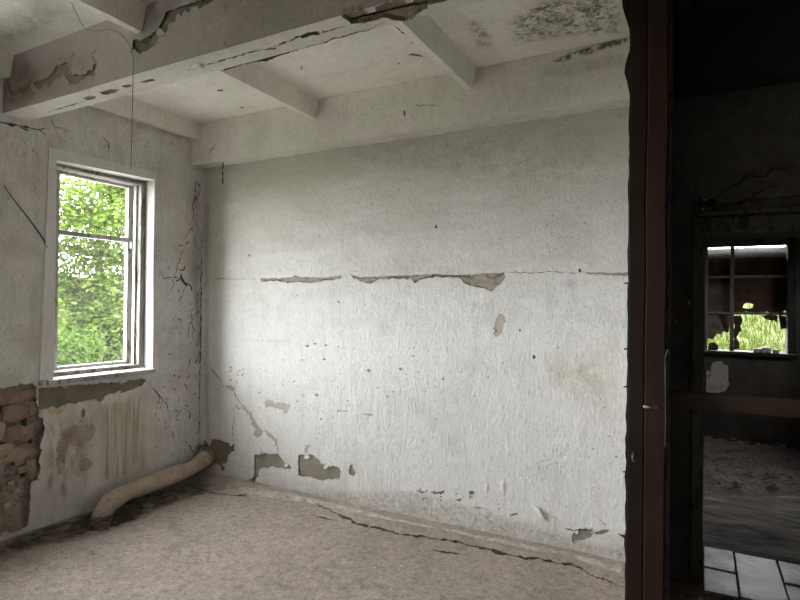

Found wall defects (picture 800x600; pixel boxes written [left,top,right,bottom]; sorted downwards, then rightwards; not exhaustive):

peeling [130,0,214,54]
crack [188,23,413,71]
damp [519,0,626,61]
peeling [6,62,97,95]
peeling [261,275,341,283]
peeling [351,272,505,291]
crack [154,181,244,454]
spalling [0,378,146,539]
peeling [204,439,235,471]
peeling [242,404,356,481]
crack [276,495,625,588]
peeling [572,529,609,543]